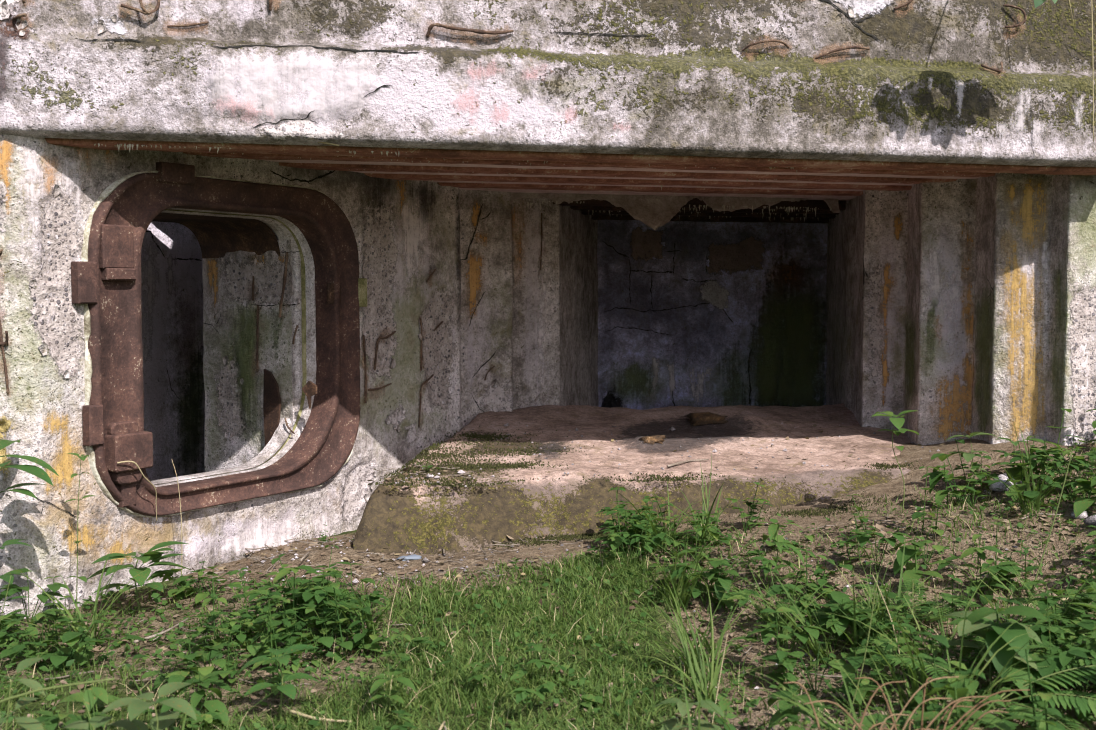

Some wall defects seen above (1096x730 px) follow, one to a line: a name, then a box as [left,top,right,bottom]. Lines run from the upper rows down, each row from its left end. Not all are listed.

crack [79,36,142,44]
crack [214,45,420,54]
peeling [510,192,840,230]
crack [603,241,733,335]
corrosion [1004,180,1047,434]
water stain [613,295,825,455]